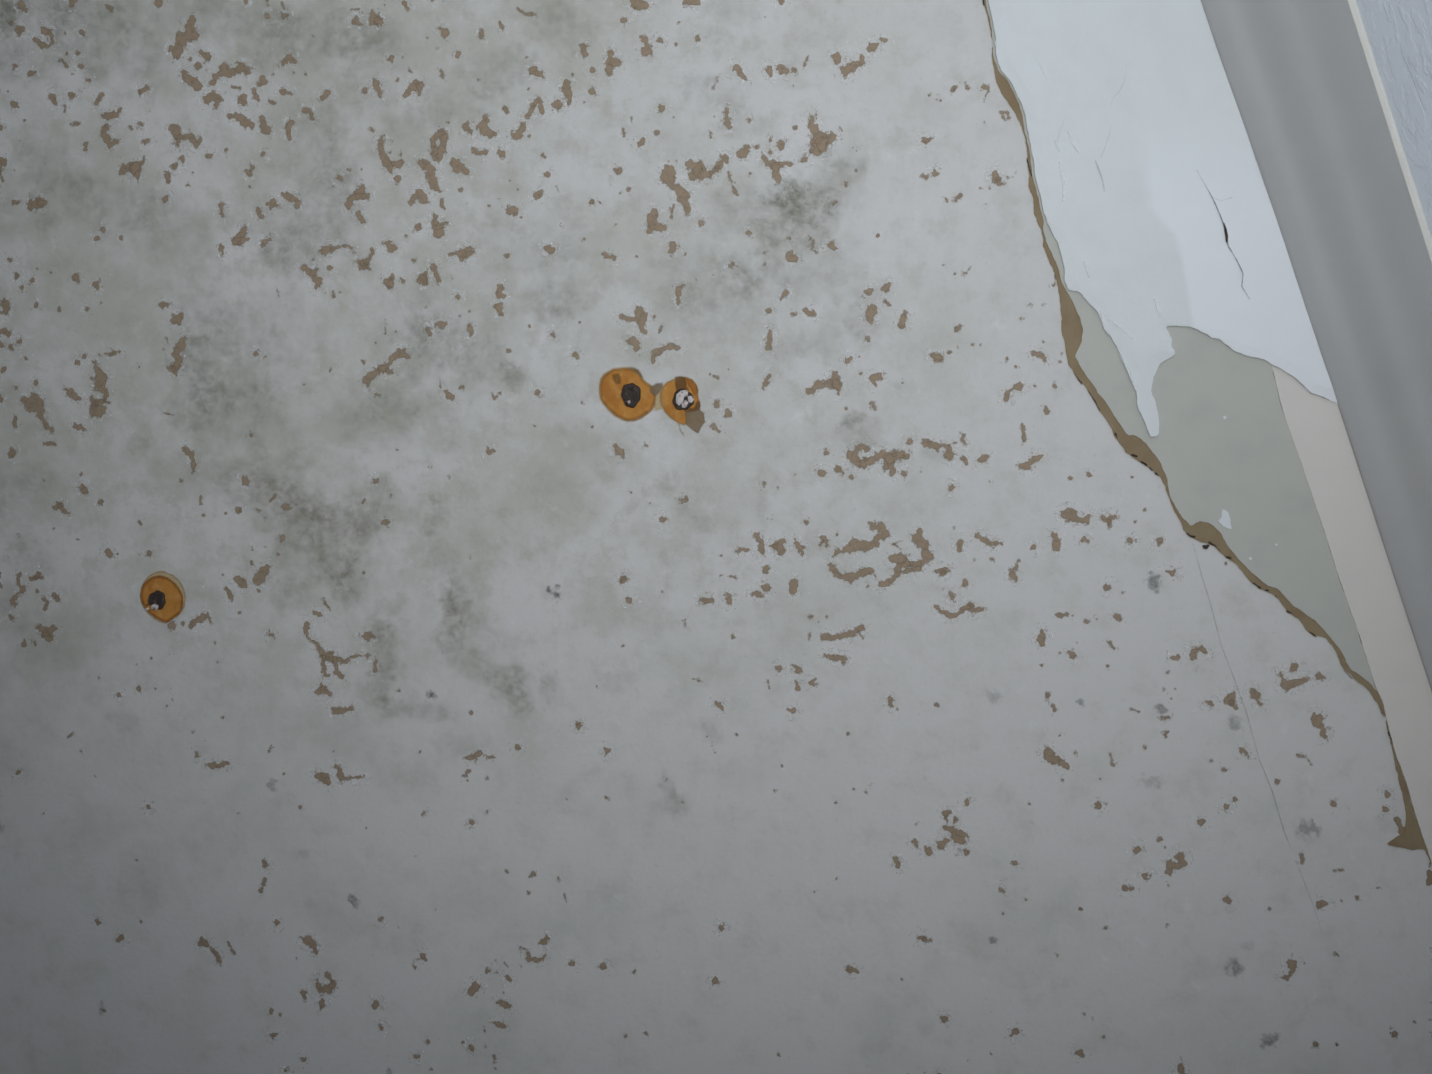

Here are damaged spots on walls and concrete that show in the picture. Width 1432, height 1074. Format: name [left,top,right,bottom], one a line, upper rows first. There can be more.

crack [1209,192,1244,290]
rust [599,368,705,433]
peeling [999,357,1036,405]
peeling [1019,423,1049,474]
peeling [1004,502,1163,582]
rust [141,572,185,622]
peeling [1033,623,1076,666]
peeling [1166,641,1214,673]
peeling [1198,662,1327,710]
peeling [1308,708,1334,744]
peeling [1036,735,1076,781]
peeling [1122,837,1192,891]